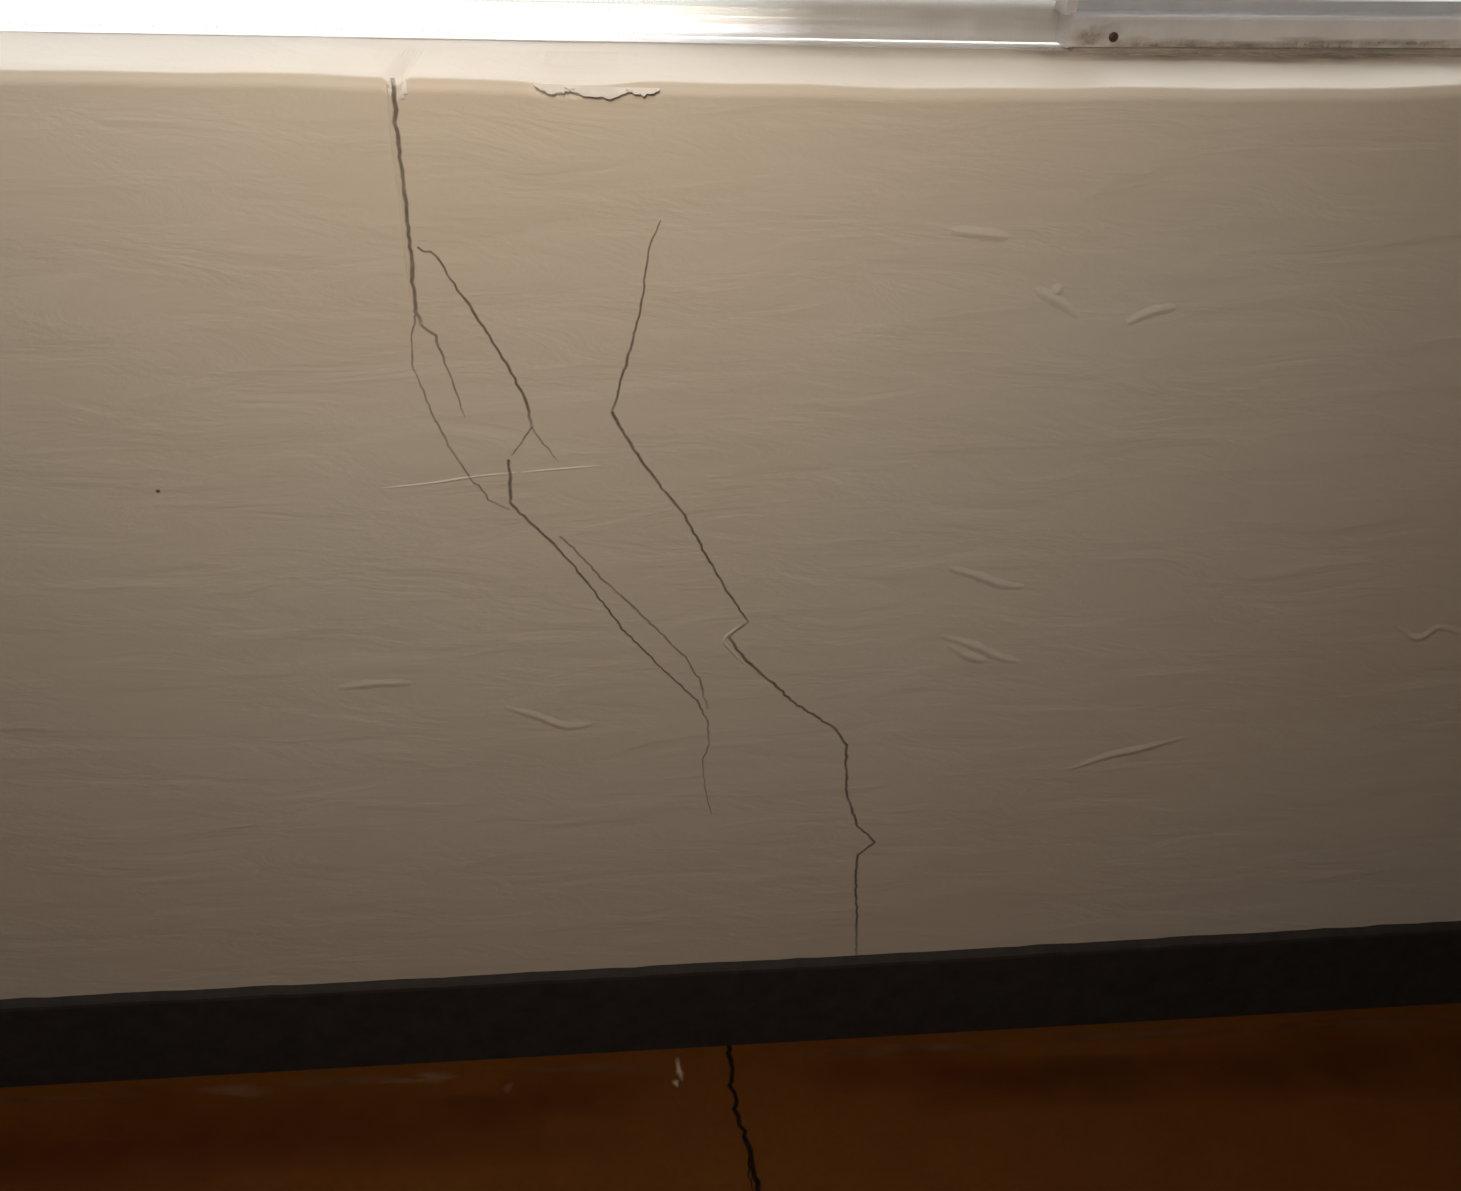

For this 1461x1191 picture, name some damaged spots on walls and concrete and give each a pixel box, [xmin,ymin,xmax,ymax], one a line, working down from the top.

crack [386,78,529,410]
crack [507,459,702,709]
crack [611,220,876,928]
crack [726,1045,760,1191]